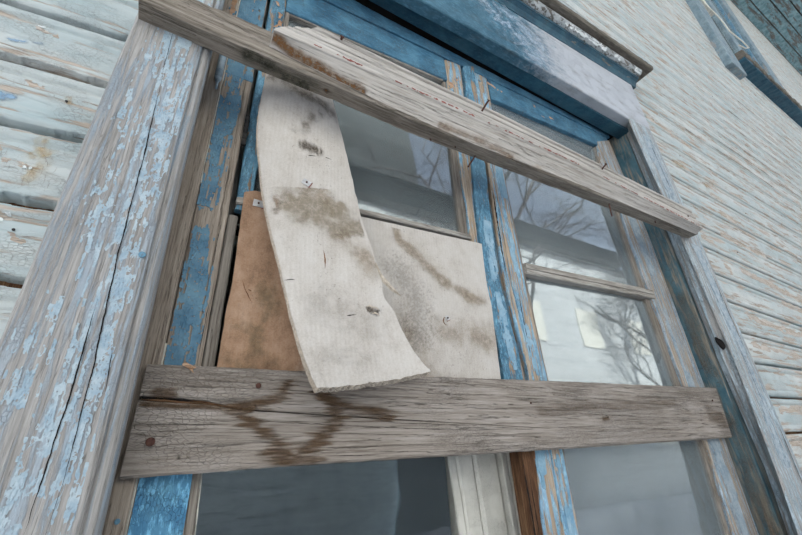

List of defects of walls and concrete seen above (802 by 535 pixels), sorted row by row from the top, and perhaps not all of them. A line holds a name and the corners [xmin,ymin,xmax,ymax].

peeling [229,0,283,29]
rust [272,33,366,94]
peeling [197,58,254,211]
peeling [0,27,193,535]
crack [25,34,173,531]
peeling [164,224,215,366]
peeling [483,219,518,370]
water stain [140,381,396,465]
crack [141,397,460,430]
peeling [535,450,575,535]
peeling [709,439,750,535]